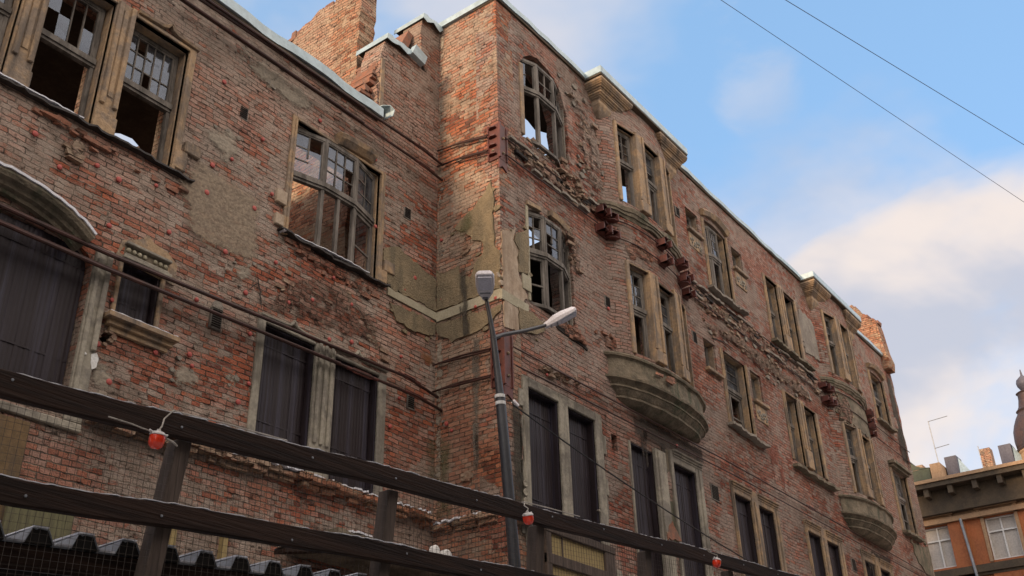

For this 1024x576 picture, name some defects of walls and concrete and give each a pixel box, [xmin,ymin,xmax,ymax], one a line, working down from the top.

spalling [507,137,589,209]
peeling [284,181,617,351]